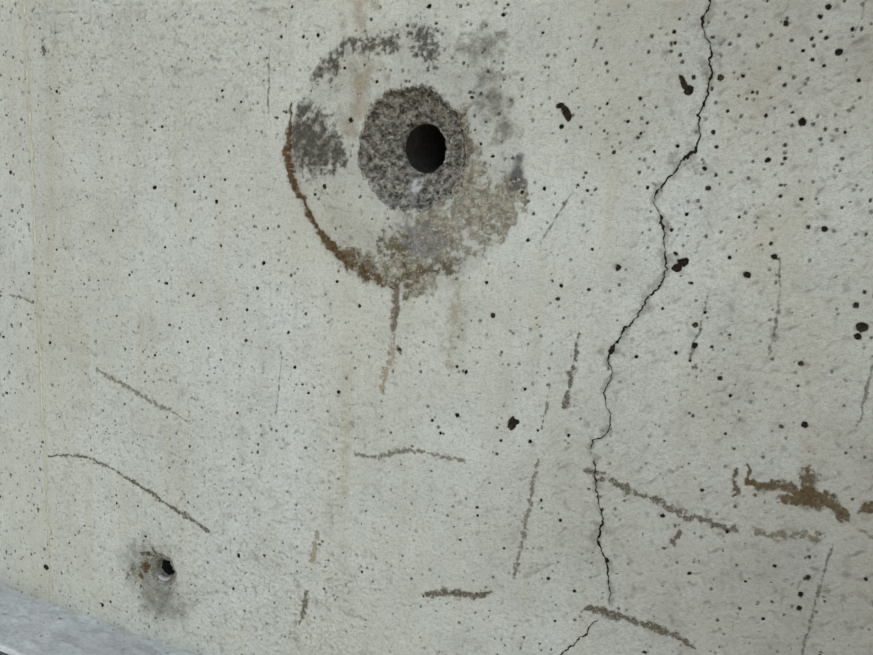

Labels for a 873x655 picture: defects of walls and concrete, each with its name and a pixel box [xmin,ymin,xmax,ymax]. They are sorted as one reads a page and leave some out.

corrosion [379,283,401,394]
crack [560,0,713,655]